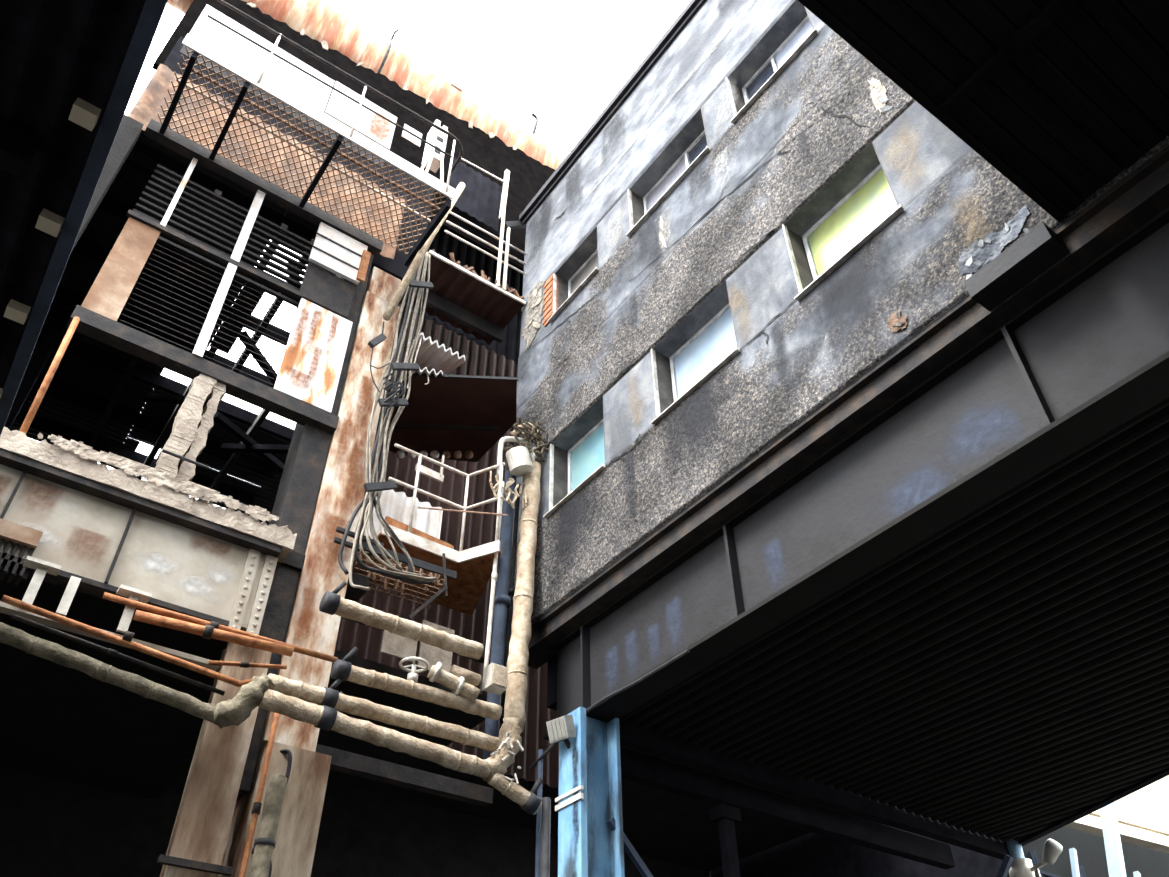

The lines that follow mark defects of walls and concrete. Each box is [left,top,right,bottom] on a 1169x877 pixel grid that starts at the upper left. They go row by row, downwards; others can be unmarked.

corrosion [370,114,390,141]
spalling [958,206,1030,280]
corrosion [291,310,338,386]
corrosion [338,377,372,496]
spalling [38,433,288,528]
corrosion [322,516,347,561]
corrosion [294,589,313,643]